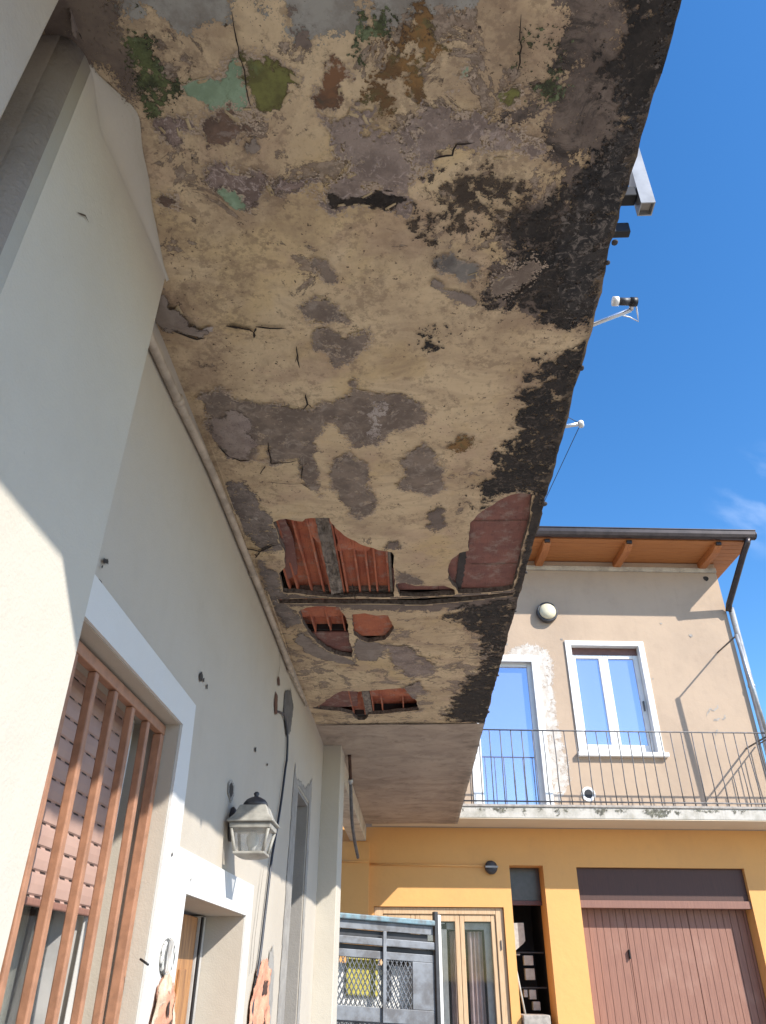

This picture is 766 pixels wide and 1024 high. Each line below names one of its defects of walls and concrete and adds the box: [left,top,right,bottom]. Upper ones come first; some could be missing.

crack [232,14,252,109]
peeling [107,0,479,51]
crack [515,19,523,73]
peeling [150,45,555,307]
crack [434,142,475,159]
peeling [155,288,213,338]
crack [157,324,300,368]
damp [275,0,681,724]
crack [219,443,308,488]
spalling [225,481,531,716]
peeling [249,764,312,1024]
spalling [150,972,176,1024]